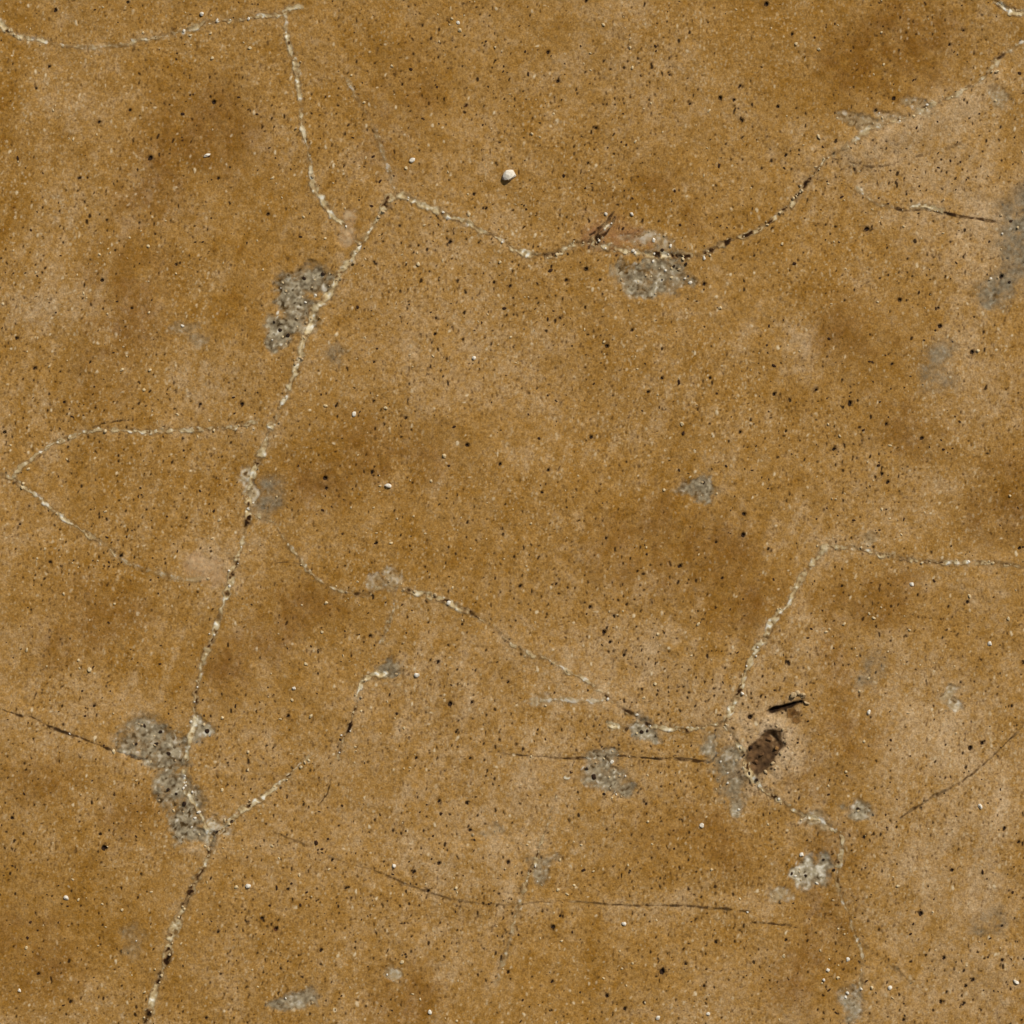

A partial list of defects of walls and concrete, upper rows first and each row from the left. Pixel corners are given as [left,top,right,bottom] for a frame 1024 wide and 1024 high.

crack [993,1,1024,16]
crack [0,4,346,229]
crack [842,41,1024,167]
crack [857,187,996,222]
spalling [616,231,705,299]
spalling [264,267,335,353]
crack [1,157,829,1024]
crack [281,534,1020,909]
spalling [116,717,229,846]
spalling [581,749,636,798]
spalling [771,852,835,902]
crack [850,922,864,990]